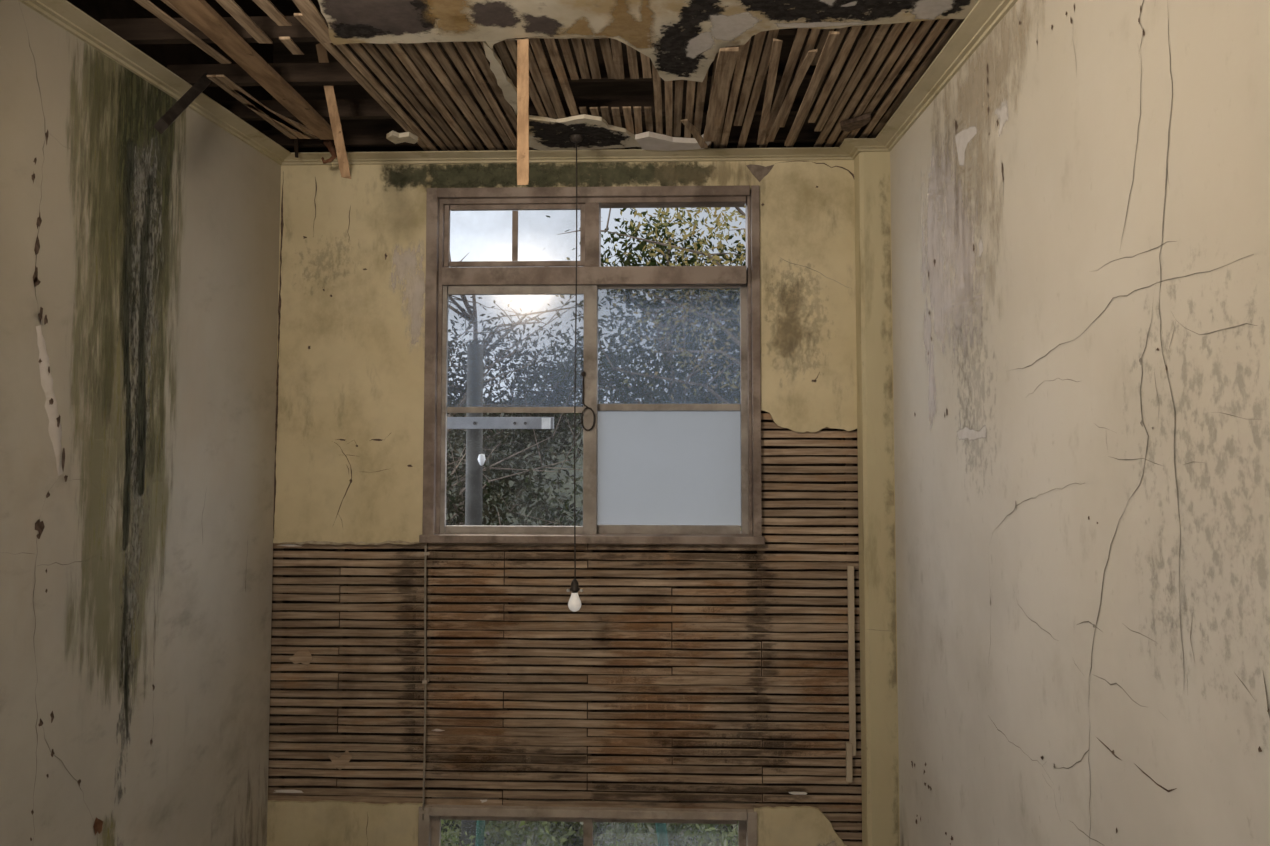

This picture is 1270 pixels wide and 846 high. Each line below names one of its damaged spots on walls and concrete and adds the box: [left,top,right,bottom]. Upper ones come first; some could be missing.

crack [19,4,83,323]
flaking render [207,75,319,139]
leakage [384,121,713,190]
flaking render [294,13,964,151]
spalling [746,164,774,182]
peeling [955,127,976,165]
leakage [117,67,177,739]
crack [987,0,1257,718]
crack [10,484,111,841]
flaking render [268,410,862,846]
crack [1236,673,1270,718]
crack [988,715,1177,845]